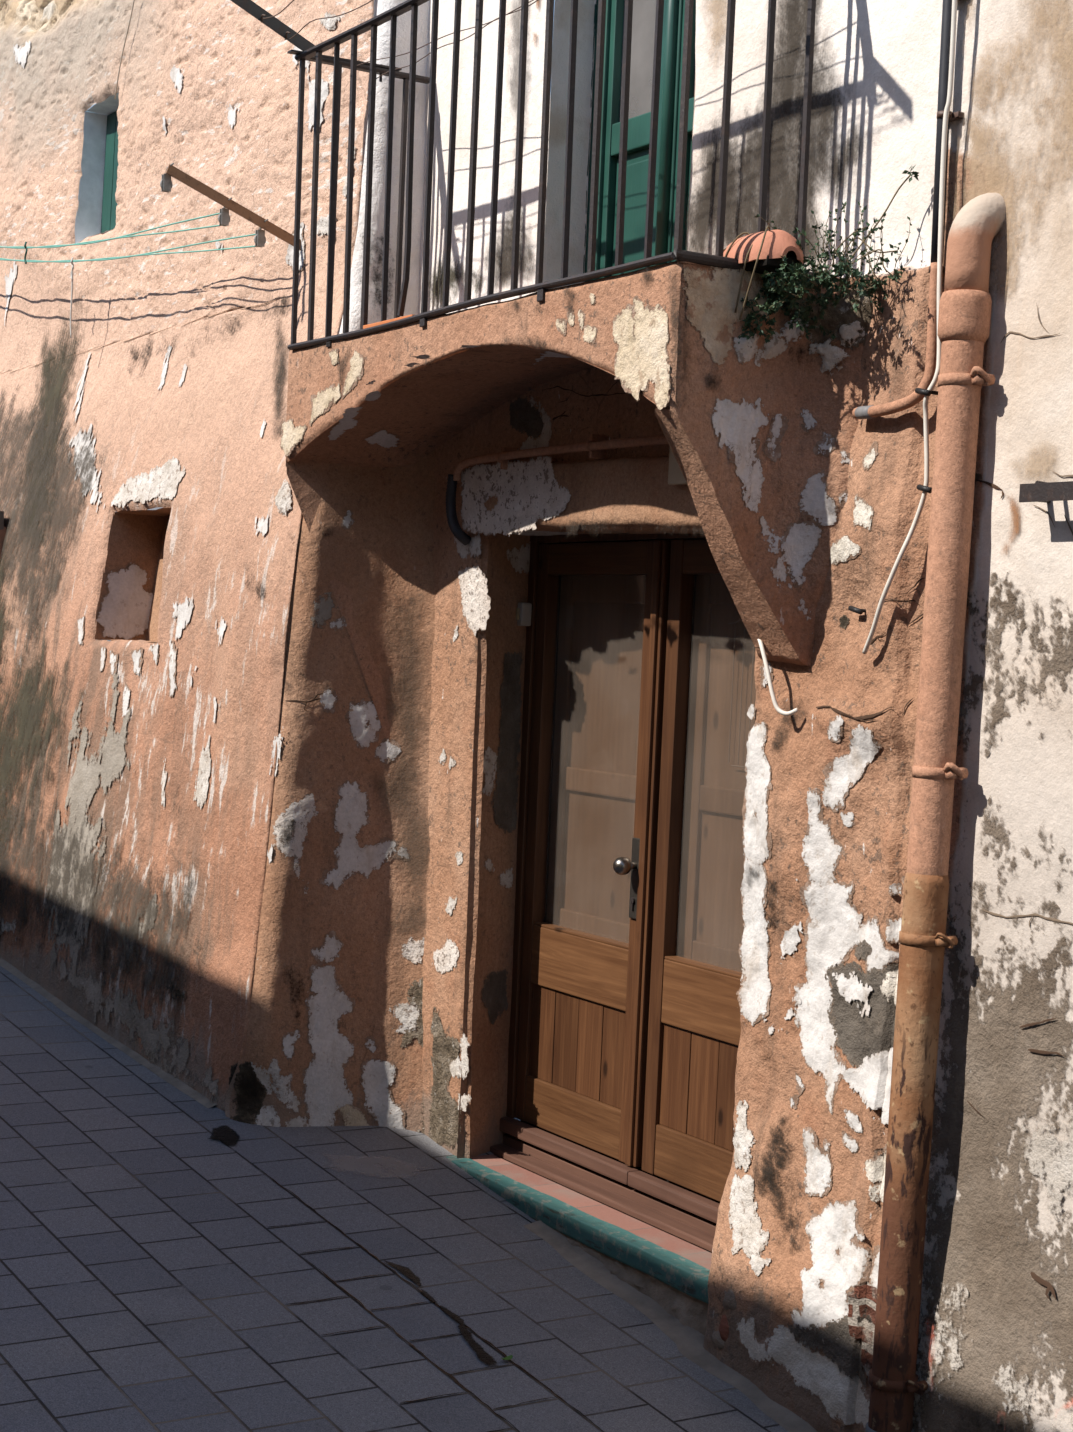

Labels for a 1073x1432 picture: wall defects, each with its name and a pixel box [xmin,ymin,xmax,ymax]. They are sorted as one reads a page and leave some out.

leakage [686,0,861,267]
leakage [946,0,1073,293]
flaking render [68,352,185,512]
leakage [128,318,239,374]
peeling [453,396,577,642]
peeling [556,293,671,410]
peeling [683,266,874,375]
peeling [957,572,1073,758]
peeling [44,563,471,1149]
peeling [728,1100,771,1276]
peeling [736,704,902,1432]
peeling [912,797,1073,1432]